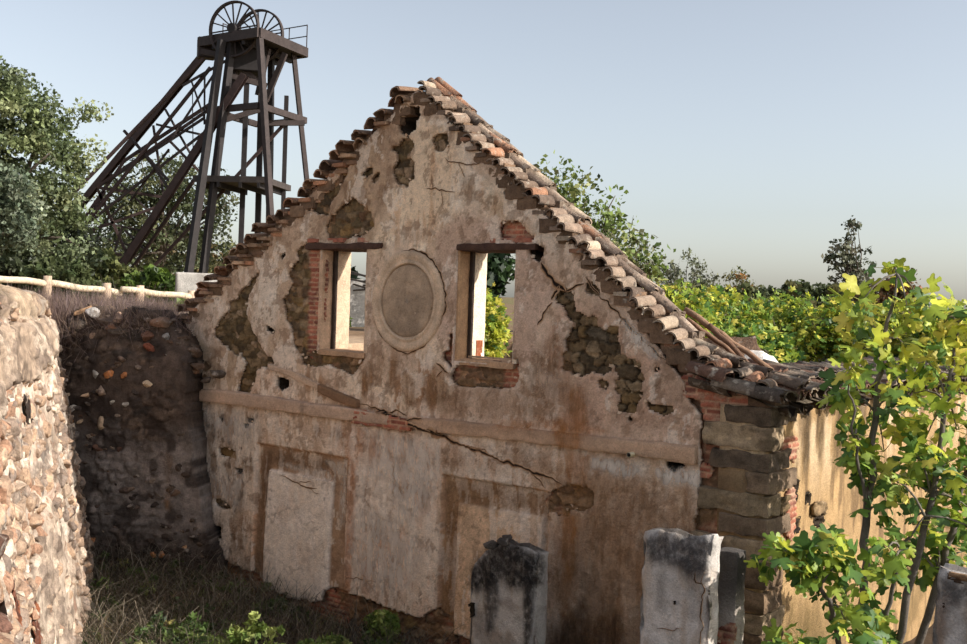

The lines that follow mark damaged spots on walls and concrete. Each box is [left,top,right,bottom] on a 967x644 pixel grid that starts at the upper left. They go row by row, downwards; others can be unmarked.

flaking render [394,105,421,188]
flaking render [434,134,449,152]
flaking render [310,171,374,239]
flaking render [501,221,544,261]
flaking render [213,273,274,393]
flaking render [280,246,364,375]
flaking render [539,288,674,421]
crack [361,404,565,488]
flaking render [545,483,594,517]
flaking render [228,565,459,644]
damp [485,576,497,631]
damp [524,564,534,644]